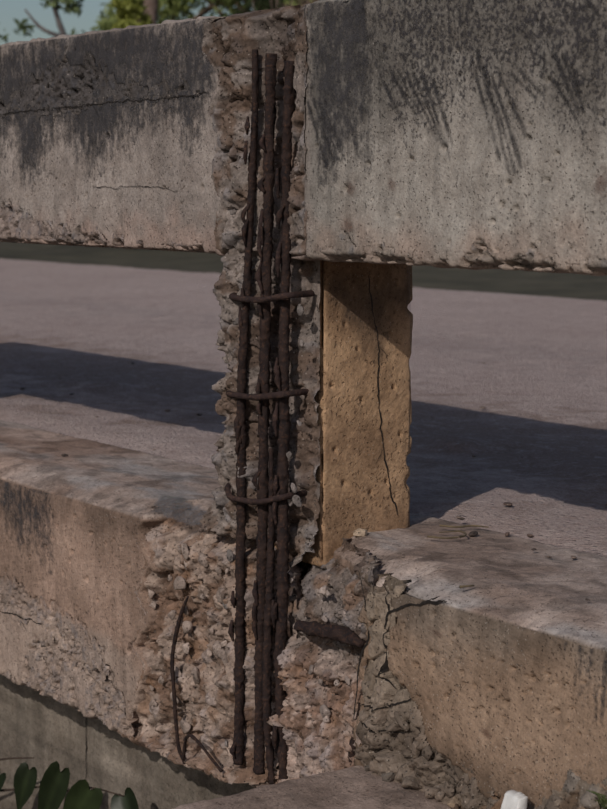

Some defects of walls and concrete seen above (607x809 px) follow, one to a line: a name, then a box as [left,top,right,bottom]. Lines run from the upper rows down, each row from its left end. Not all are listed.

crack [3,90,207,118]
water stain [0,19,213,181]
water stain [304,0,607,184]
crack [95,185,184,193]
spalling [463,239,574,268]
spalling [0,3,310,788]
spalling [225,49,504,809]
crack [368,276,398,515]
water stain [0,480,54,555]
crack [0,611,41,630]
crack [353,573,447,733]
spalling [527,769,607,809]